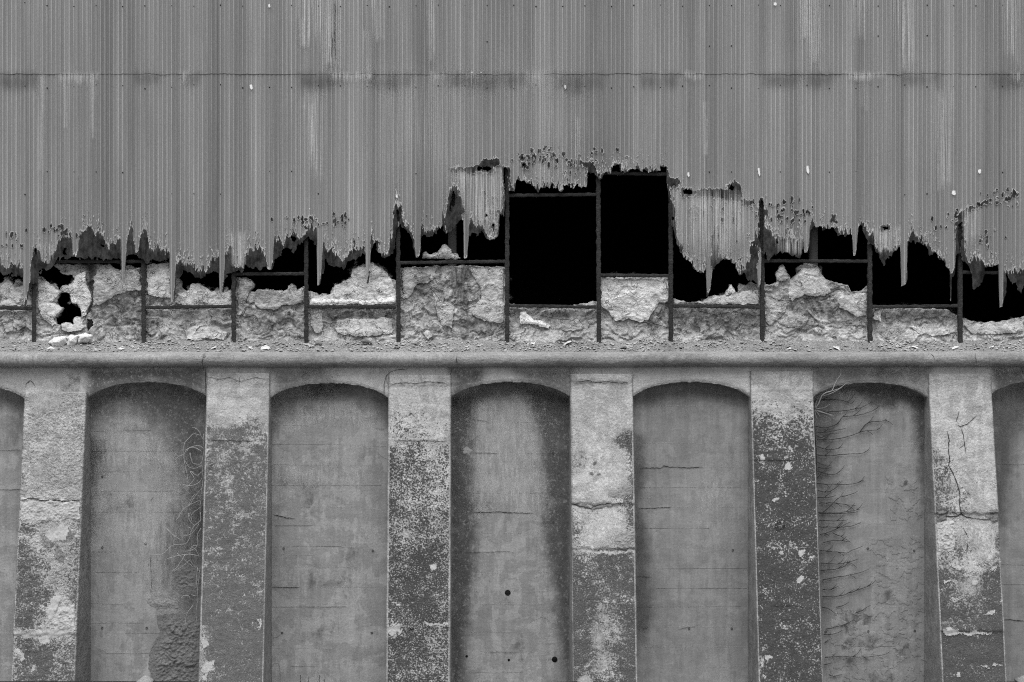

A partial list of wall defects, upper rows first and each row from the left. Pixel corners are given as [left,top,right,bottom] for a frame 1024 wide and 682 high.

peeling [0,263,454,333]
peeling [469,267,504,323]
peeling [601,277,669,322]
peeling [700,266,882,327]
peeling [185,325,228,357]
peeling [336,317,393,337]
peeling [519,311,583,345]
peeling [911,320,1024,349]
crack [1,489,77,502]
crack [571,502,670,510]
crack [946,413,993,554]